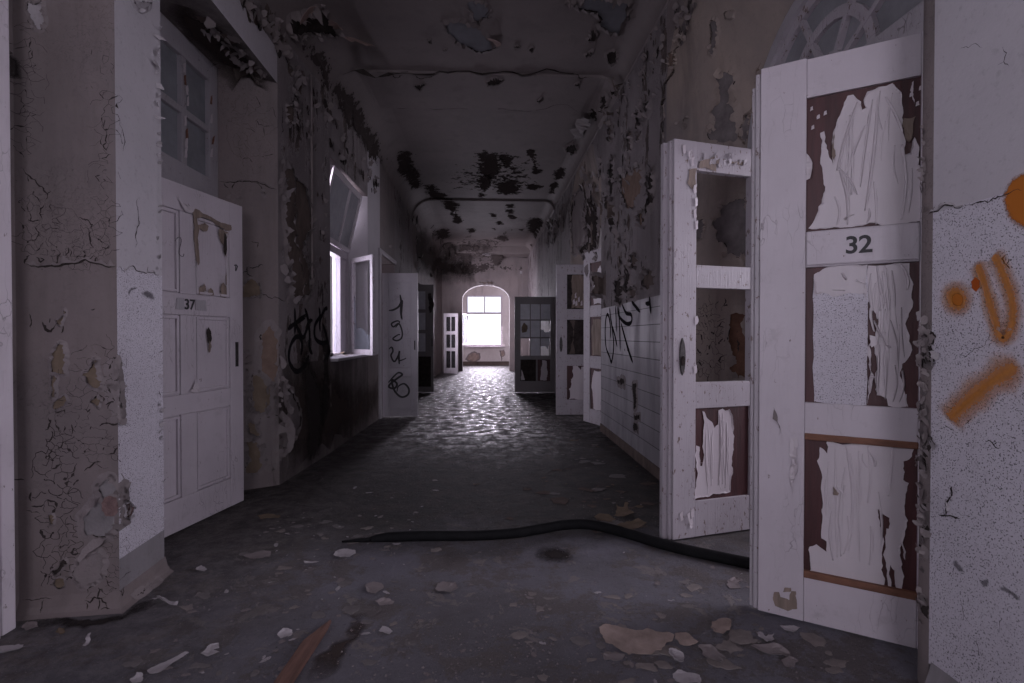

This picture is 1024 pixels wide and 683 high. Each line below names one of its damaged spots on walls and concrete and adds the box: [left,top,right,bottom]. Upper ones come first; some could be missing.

crack [9,19,156,275]
peeling [188,204,232,265]
peeling [545,90,658,307]
flaking render [683,15,752,267]
peeling [806,81,927,229]
crack [929,189,1022,214]
crack [14,314,144,613]
peeling [48,340,127,425]
flaking render [50,471,136,591]
flaking render [243,319,302,477]
peeling [680,409,734,528]
peeling [809,263,939,589]